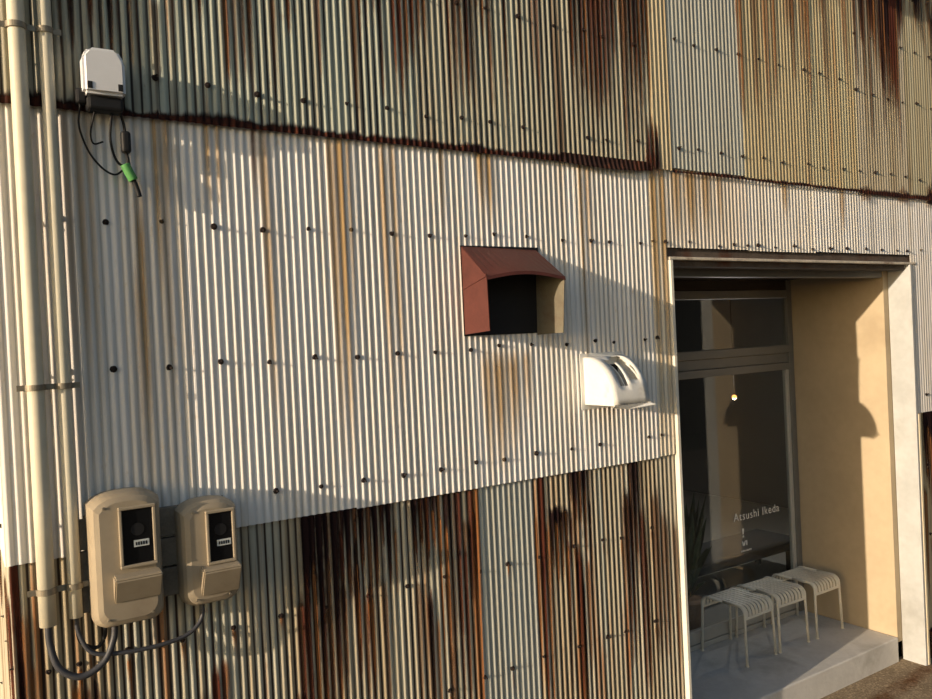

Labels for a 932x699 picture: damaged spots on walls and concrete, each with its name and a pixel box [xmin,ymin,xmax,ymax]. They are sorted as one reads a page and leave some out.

corrosion [0,92,11,104]
corrosion [29,90,42,107]
corrosion [122,108,561,161]
corrosion [373,0,425,91]
corrosion [446,0,492,98]
corrosion [569,0,650,134]
corrosion [853,0,932,138]
corrosion [922,411,932,593]
corrosion [0,557,33,699]
corrosion [298,503,398,699]
corrosion [534,470,593,699]
corrosion [621,462,671,687]